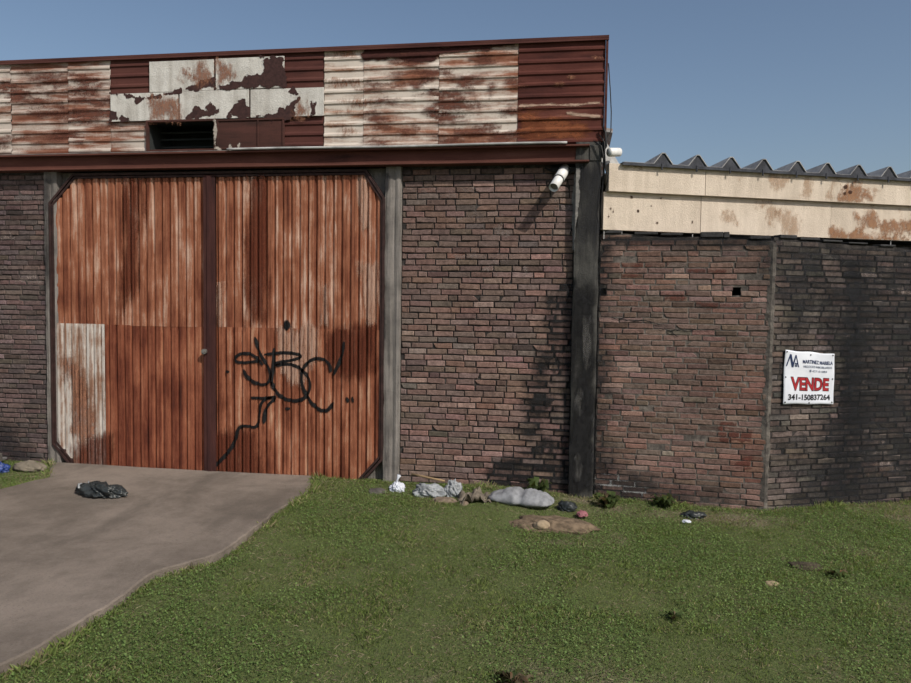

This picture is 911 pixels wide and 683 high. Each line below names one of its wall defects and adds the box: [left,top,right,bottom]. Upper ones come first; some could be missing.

rust [0,71,115,143]
peeling [109,55,317,151]
rust [118,177,148,316]
rust [245,177,271,322]
rust [357,178,370,230]
rust [829,181,911,240]
rust [278,263,380,385]
water stain [486,162,911,507]
rust [61,357,113,465]
rust [216,426,264,473]